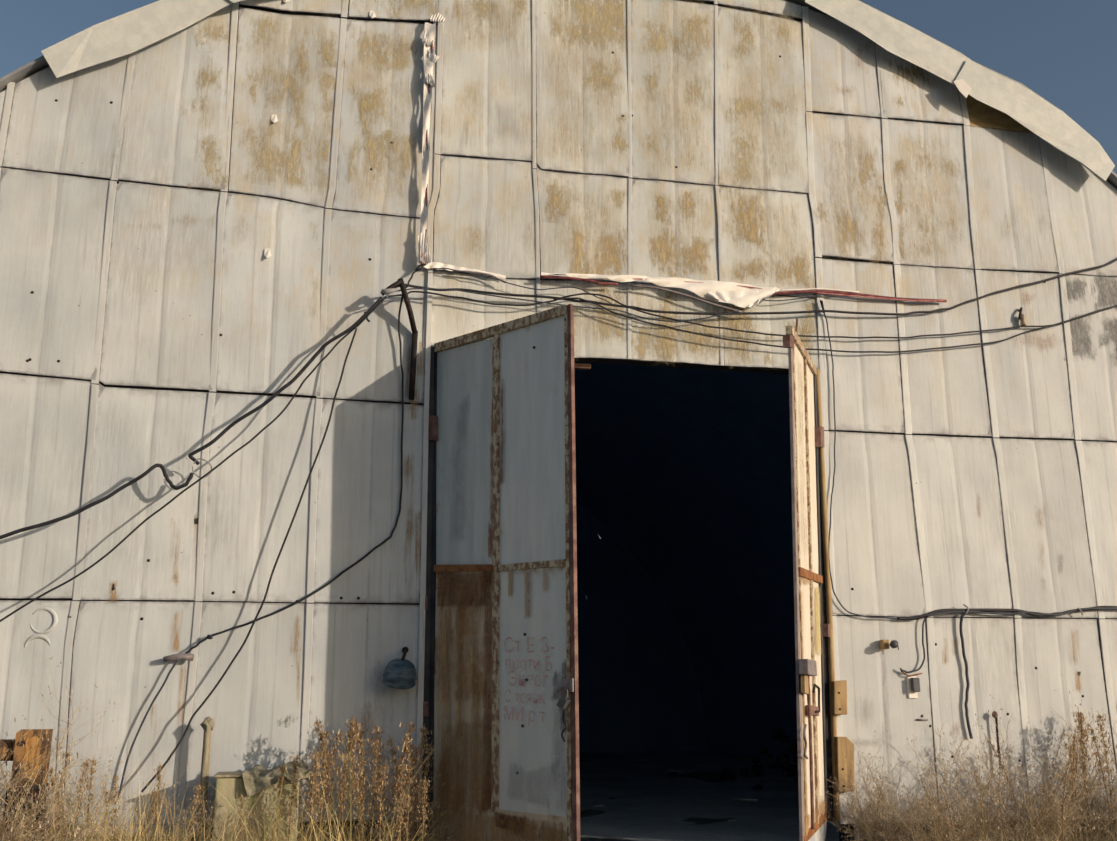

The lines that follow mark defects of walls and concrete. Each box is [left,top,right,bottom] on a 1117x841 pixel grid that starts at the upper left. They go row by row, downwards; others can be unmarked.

peeling [247,40,307,185]
peeling [349,89,410,180]
peeling [890,64,929,82]
peeling [733,196,764,244]
peeling [859,154,906,261]
peeling [778,258,810,288]
corrosion [488,386,503,557]
corrosion [800,577,821,659]
corrosion [804,736,826,836]